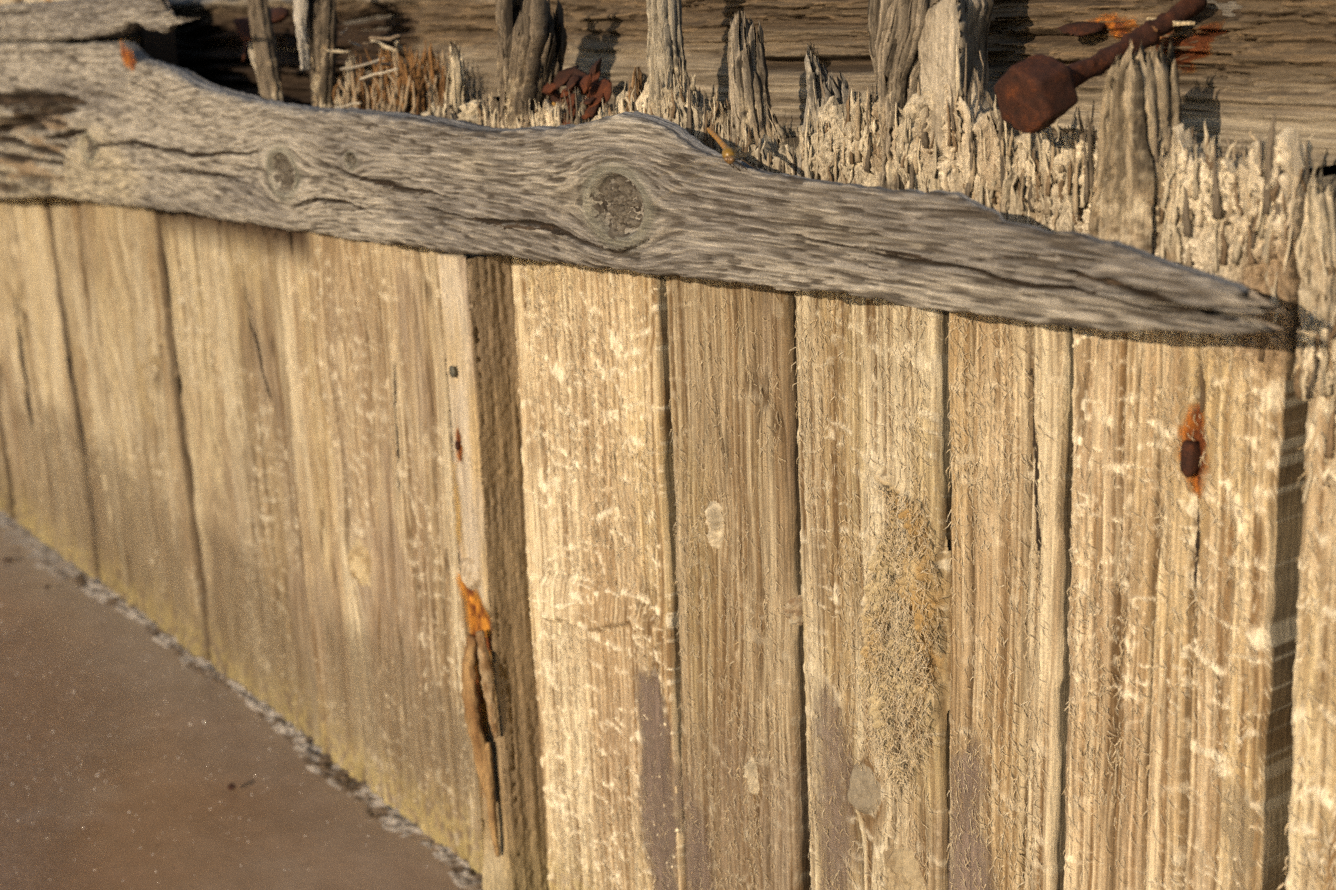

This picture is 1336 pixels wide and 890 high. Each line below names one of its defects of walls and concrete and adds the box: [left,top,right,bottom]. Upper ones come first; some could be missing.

rust [1057,15,1136,37]
rust [1155,22,1228,73]
crack [0,93,252,182]
rust [1178,405,1208,497]
rust [456,575,493,741]